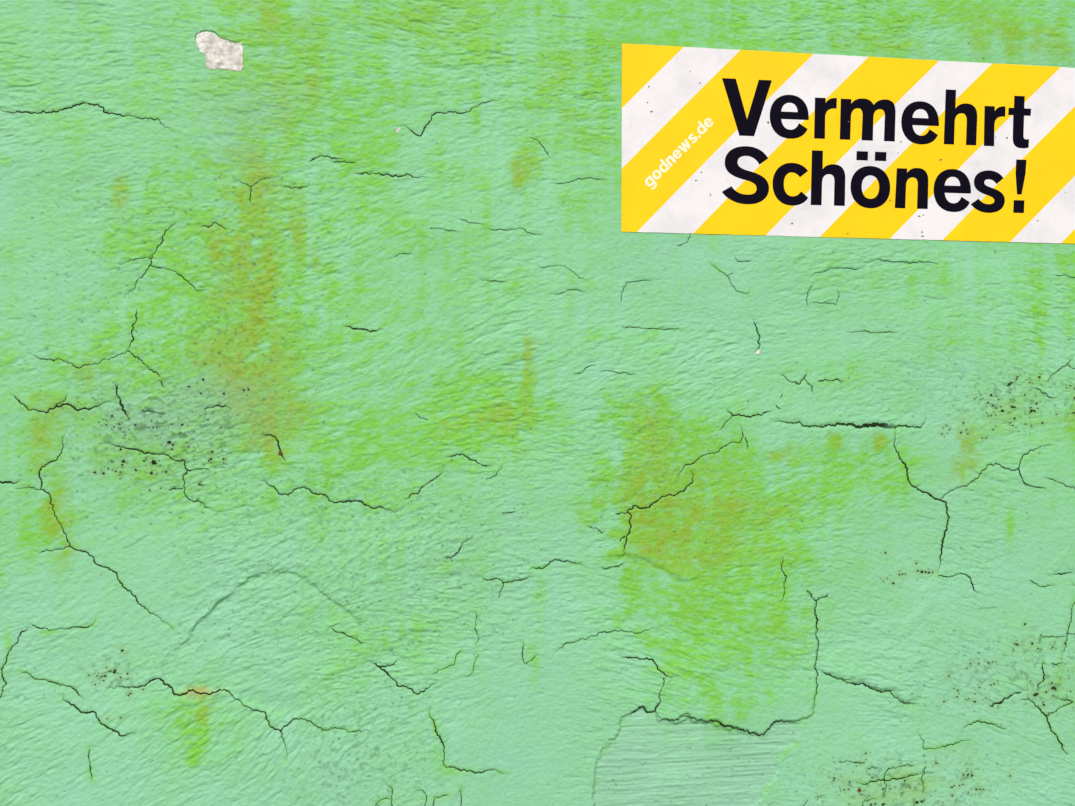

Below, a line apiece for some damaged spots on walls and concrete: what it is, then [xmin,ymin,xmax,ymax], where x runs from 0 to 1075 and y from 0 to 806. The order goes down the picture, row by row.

peeling [196,32,244,71]
crack [15,224,202,419]
crack [0,625,130,737]
crack [0,440,160,618]
crack [117,678,360,747]
damp [0,308,559,585]
crack [332,615,495,806]
spalling [592,590,819,806]
crack [484,374,1075,597]
damp [530,374,1043,752]
crack [781,562,913,705]
crack [839,602,1075,806]